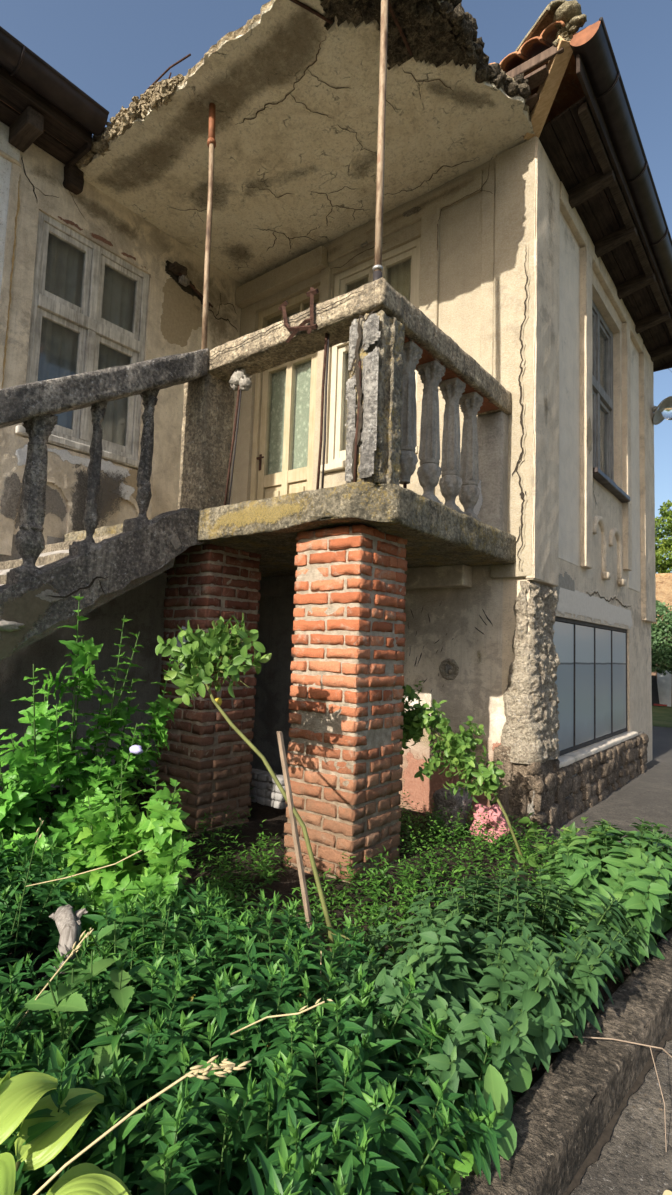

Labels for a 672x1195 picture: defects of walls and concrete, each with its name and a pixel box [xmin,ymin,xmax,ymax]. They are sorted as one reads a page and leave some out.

spalling [76,54,191,170]
damp [104,12,318,189]
crack [237,38,375,153]
flaking render [58,216,151,277]
peeling [160,260,213,347]
damp [193,183,227,208]
crack [248,157,493,250]
crack [512,244,530,571]
peeling [0,444,28,562]
peeling [45,448,138,531]
flaking render [492,581,560,764]
flaking render [402,752,489,822]